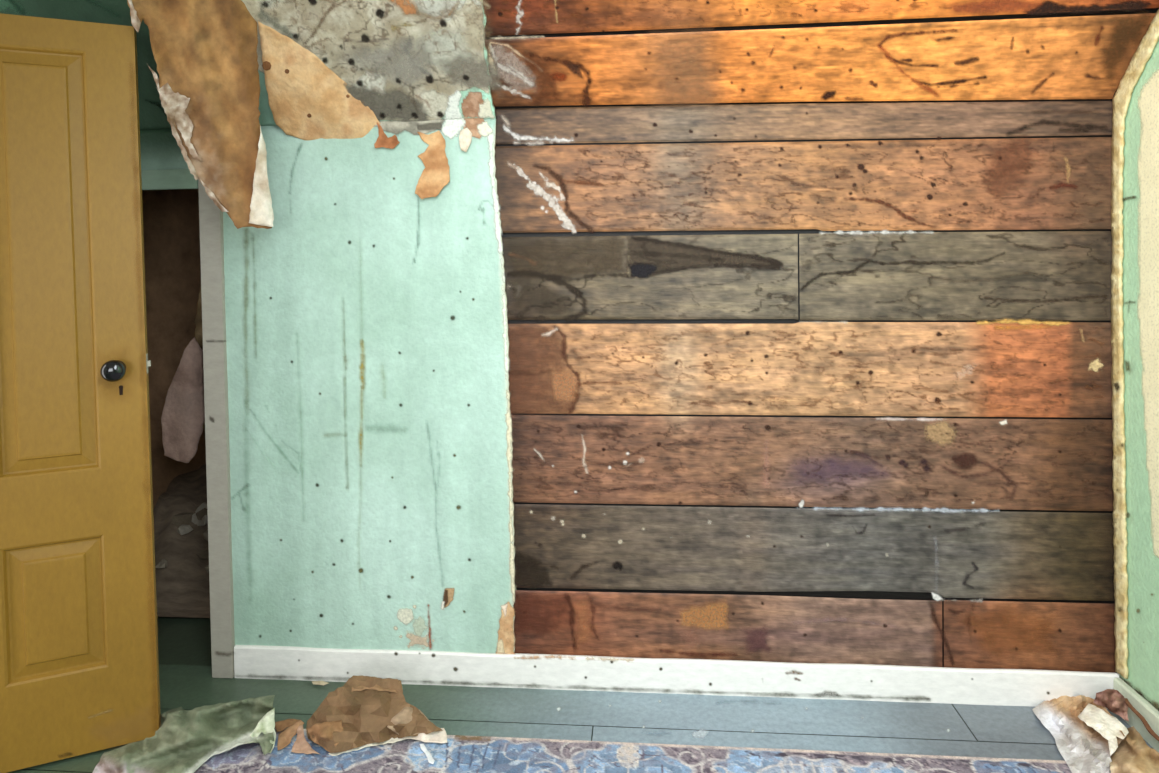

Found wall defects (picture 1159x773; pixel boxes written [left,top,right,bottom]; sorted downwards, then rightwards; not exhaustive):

peeling [241,0,509,376]
peeling [1138,70,1159,558]